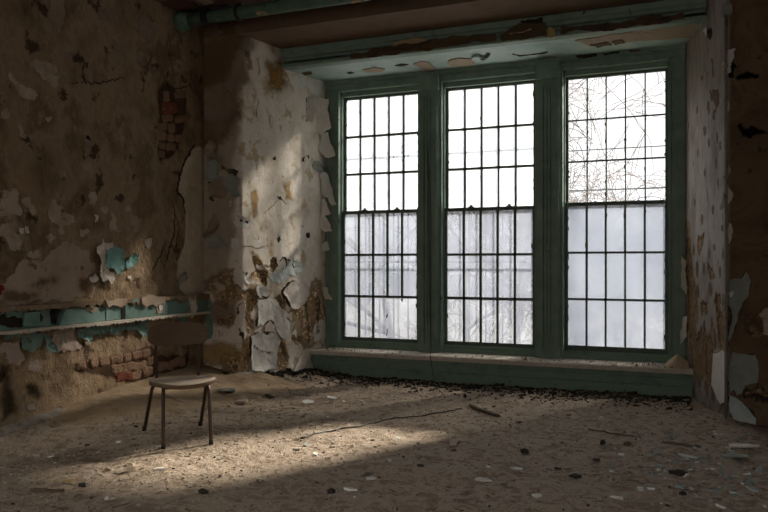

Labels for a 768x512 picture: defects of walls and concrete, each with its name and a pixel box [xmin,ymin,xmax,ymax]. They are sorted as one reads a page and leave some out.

flaking render [156,83,187,160]
peeling [288,71,336,252]
peeling [448,53,490,67]
peeling [575,23,712,58]
peeling [0,188,188,383]
spalling [176,141,332,373]
peeling [680,179,768,425]